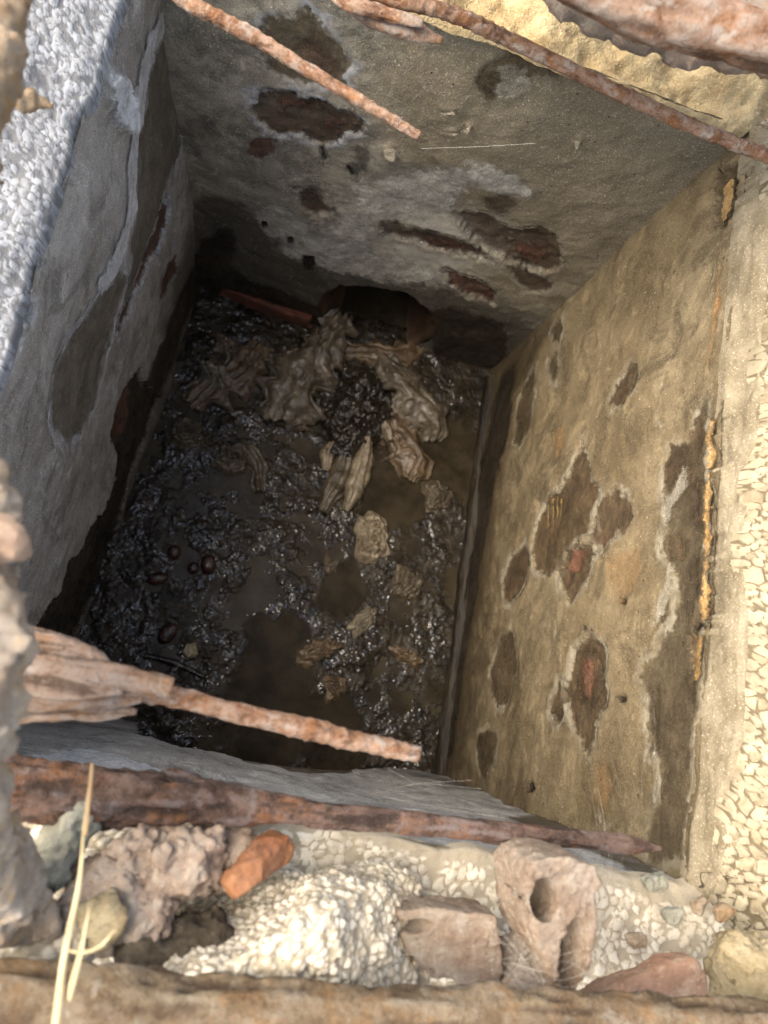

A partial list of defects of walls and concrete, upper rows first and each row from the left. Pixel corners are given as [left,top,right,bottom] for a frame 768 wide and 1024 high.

spalling [172,0,422,159]
spalling [296,186,335,216]
spalling [443,267,495,302]
spalling [381,210,561,291]
spalling [609,363,637,411]
spalling [504,442,633,604]
spalling [550,629,610,756]